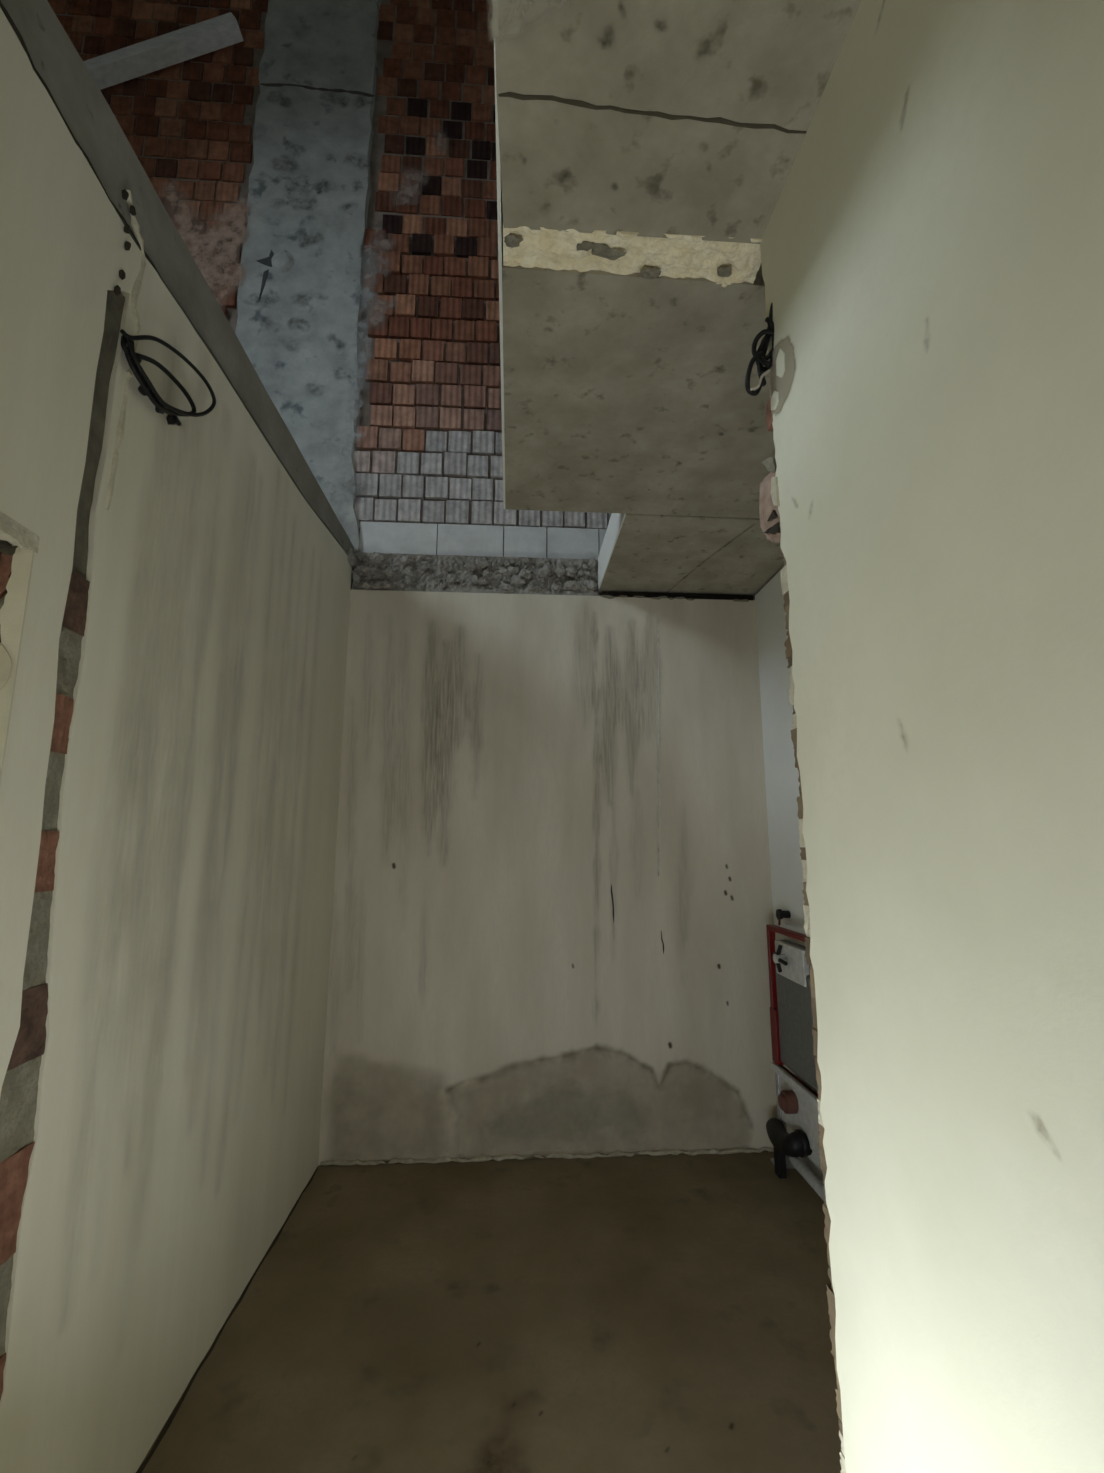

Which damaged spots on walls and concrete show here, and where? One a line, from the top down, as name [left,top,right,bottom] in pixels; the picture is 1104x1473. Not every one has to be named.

crack [498,92,807,134]